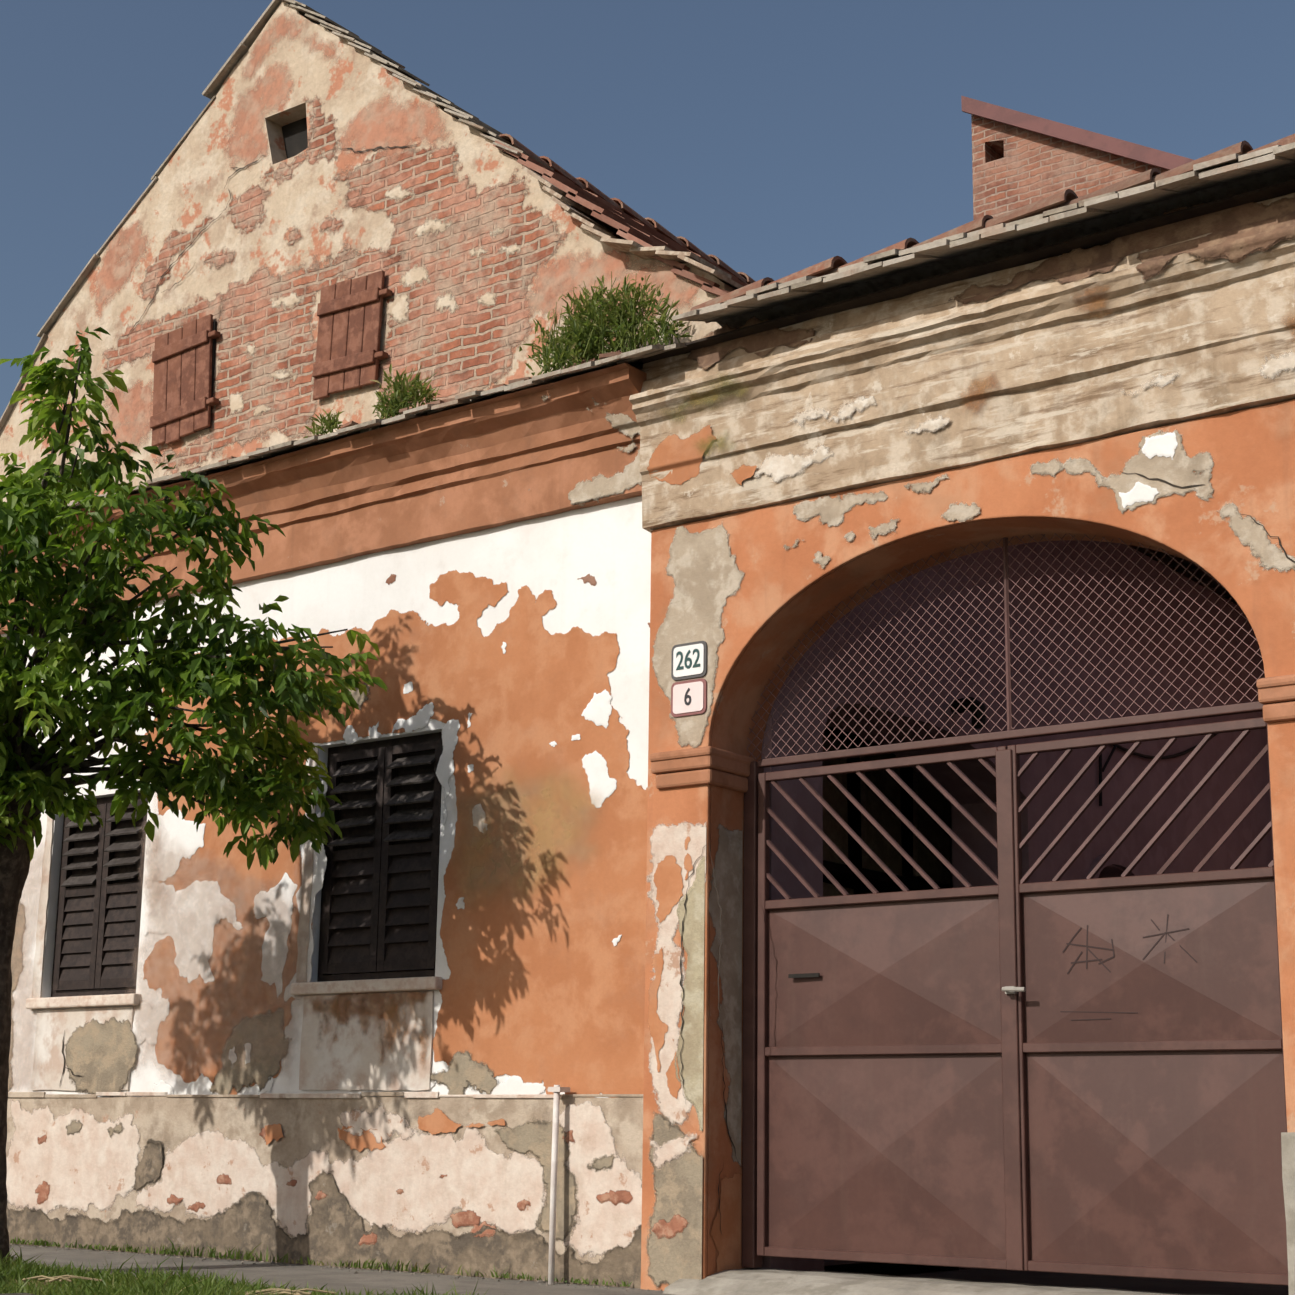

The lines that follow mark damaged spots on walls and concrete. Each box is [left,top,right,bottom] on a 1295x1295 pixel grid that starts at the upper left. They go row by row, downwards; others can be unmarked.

crack [339,143,420,153]
crack [128,155,263,335]
spalling [95,15,699,474]
spalling [949,197,1295,304]
peeling [1260,352,1295,379]
peeling [789,396,877,427]
peeling [905,415,950,433]
peeling [730,445,834,485]
spalling [793,491,899,542]
spalling [941,502,980,522]
flaking render [648,524,744,748]
peeling [6,570,742,1289]